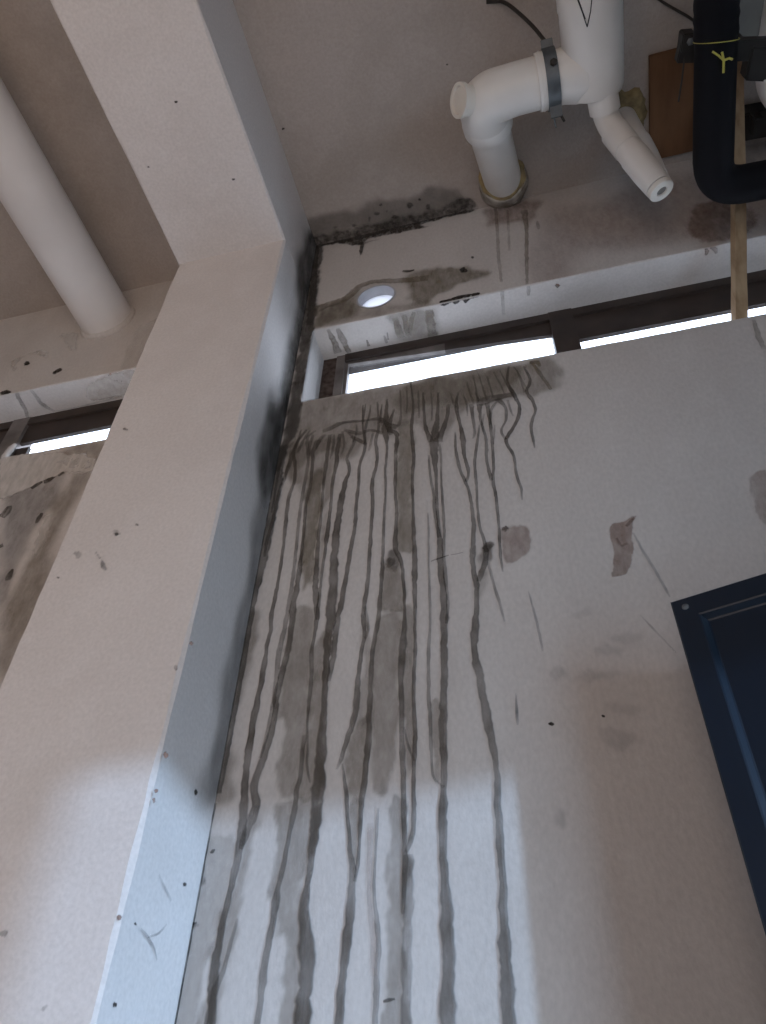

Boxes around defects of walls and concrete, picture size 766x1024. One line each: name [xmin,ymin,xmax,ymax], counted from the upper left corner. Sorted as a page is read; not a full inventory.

leakage [207,872,238,1024]
leakage [217,199,550,1024]